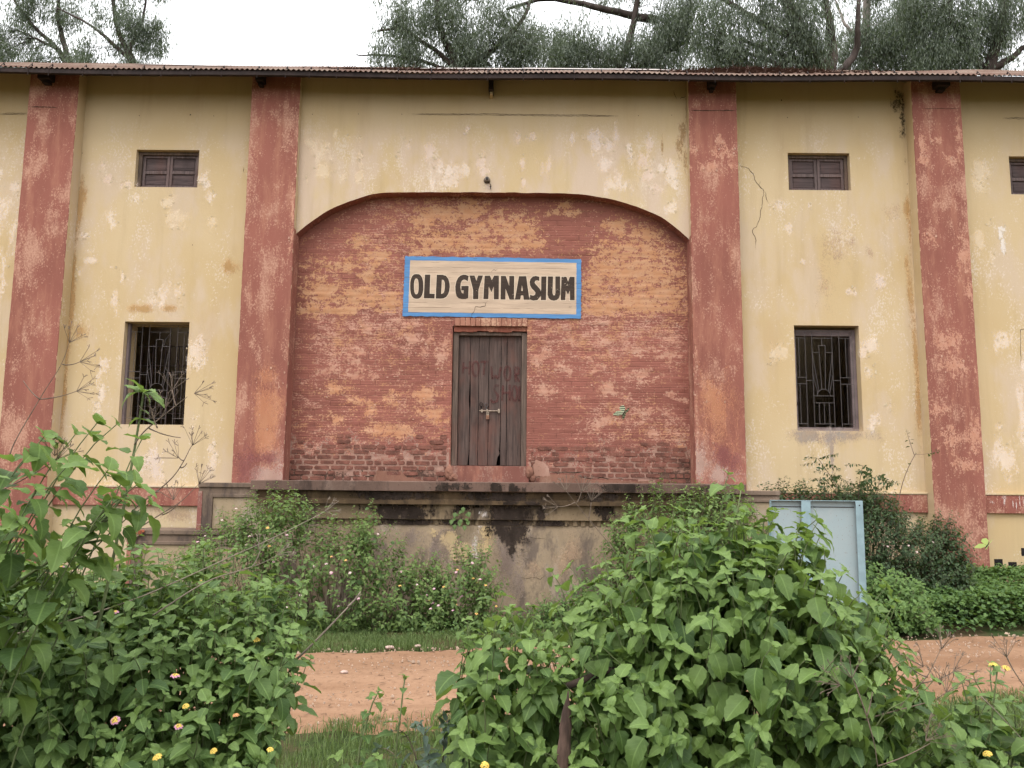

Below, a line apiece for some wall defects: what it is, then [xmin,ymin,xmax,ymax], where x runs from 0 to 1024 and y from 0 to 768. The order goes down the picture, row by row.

mould [890,90,905,138]
peeling [916,114,989,193]
peeling [0,171,20,298]
peeling [254,121,742,484]
peeling [922,217,1007,307]
peeling [925,326,1024,484]
damp [349,467,582,602]